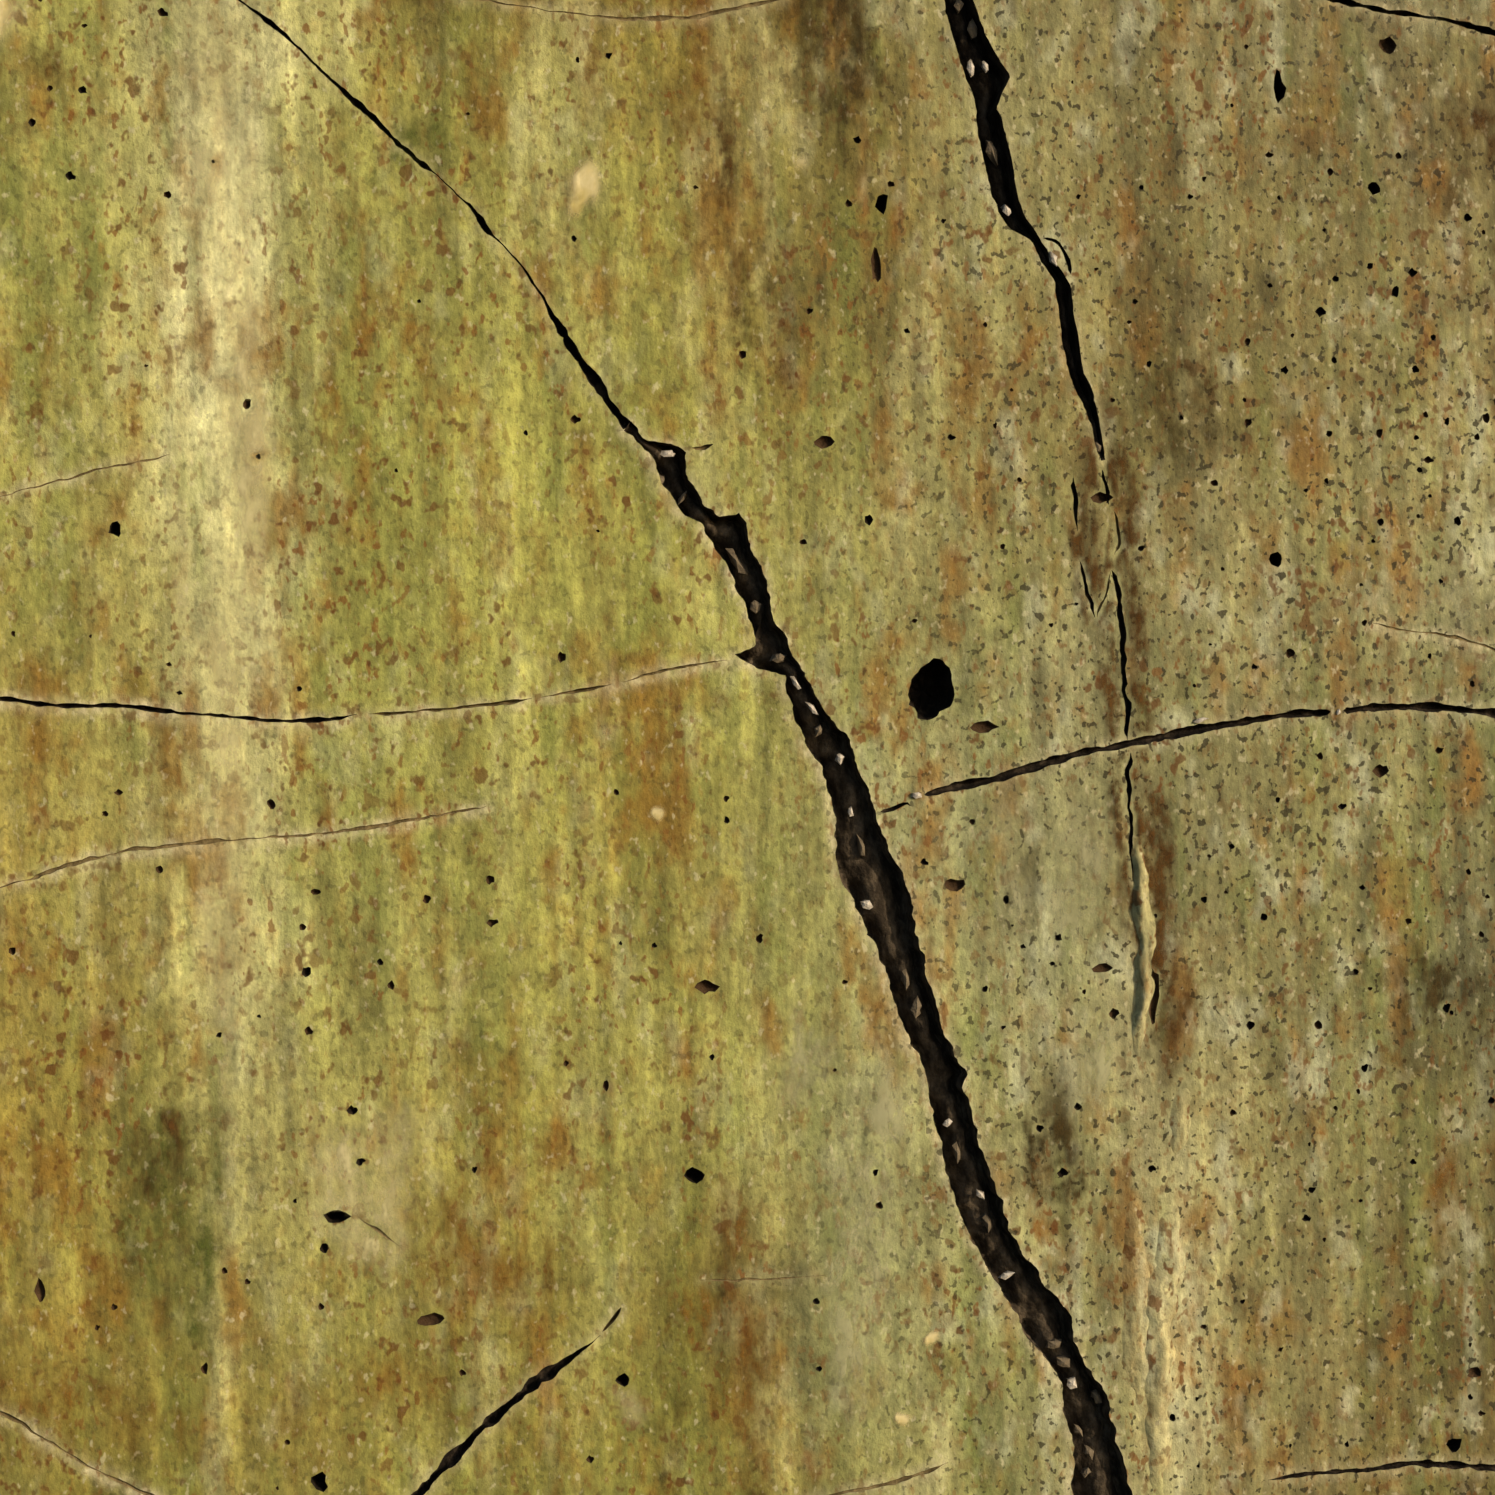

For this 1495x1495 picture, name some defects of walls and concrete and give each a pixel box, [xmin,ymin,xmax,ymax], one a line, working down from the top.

crack [1328,0,1495,36]
crack [0,455,166,497]
crack [0,696,357,723]
crack [238,0,1133,1495]
crack [911,562,1495,799]
crack [0,806,486,888]
crack [0,1411,154,1495]
crack [1270,1459,1495,1480]